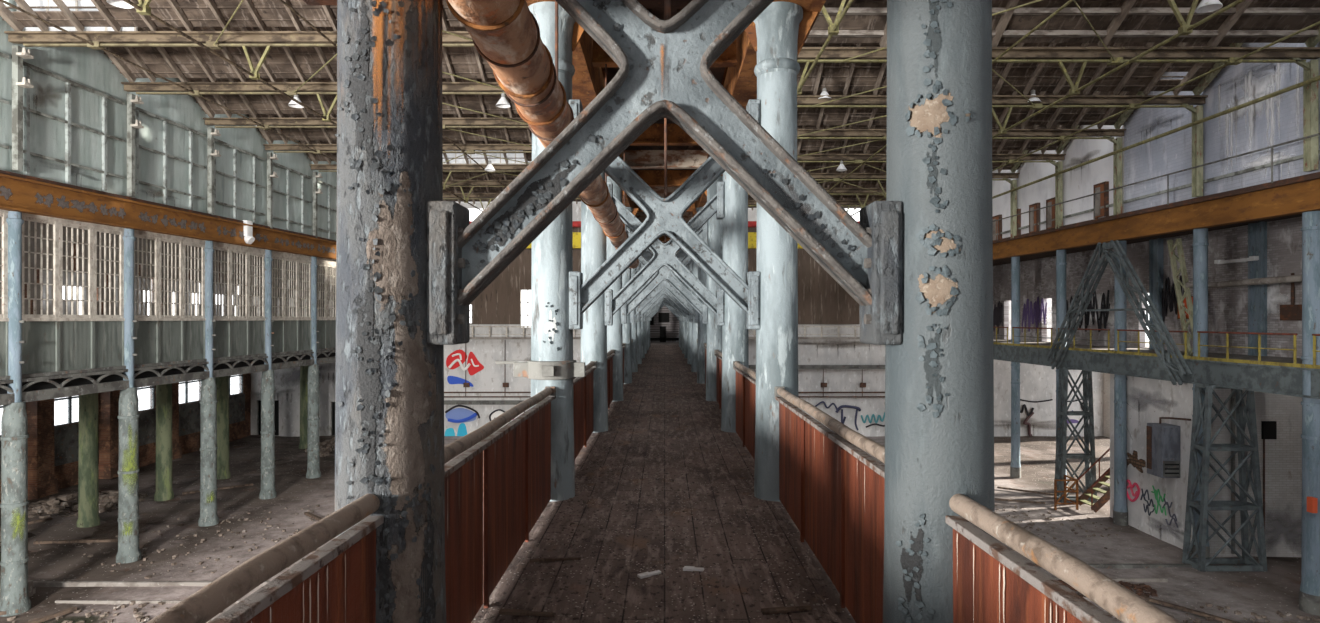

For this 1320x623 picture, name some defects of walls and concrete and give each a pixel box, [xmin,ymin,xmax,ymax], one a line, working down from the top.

corrosion [374,0,403,76]
peeling [337,0,441,623]
peeling [905,0,961,418]
peeling [895,514,935,623]